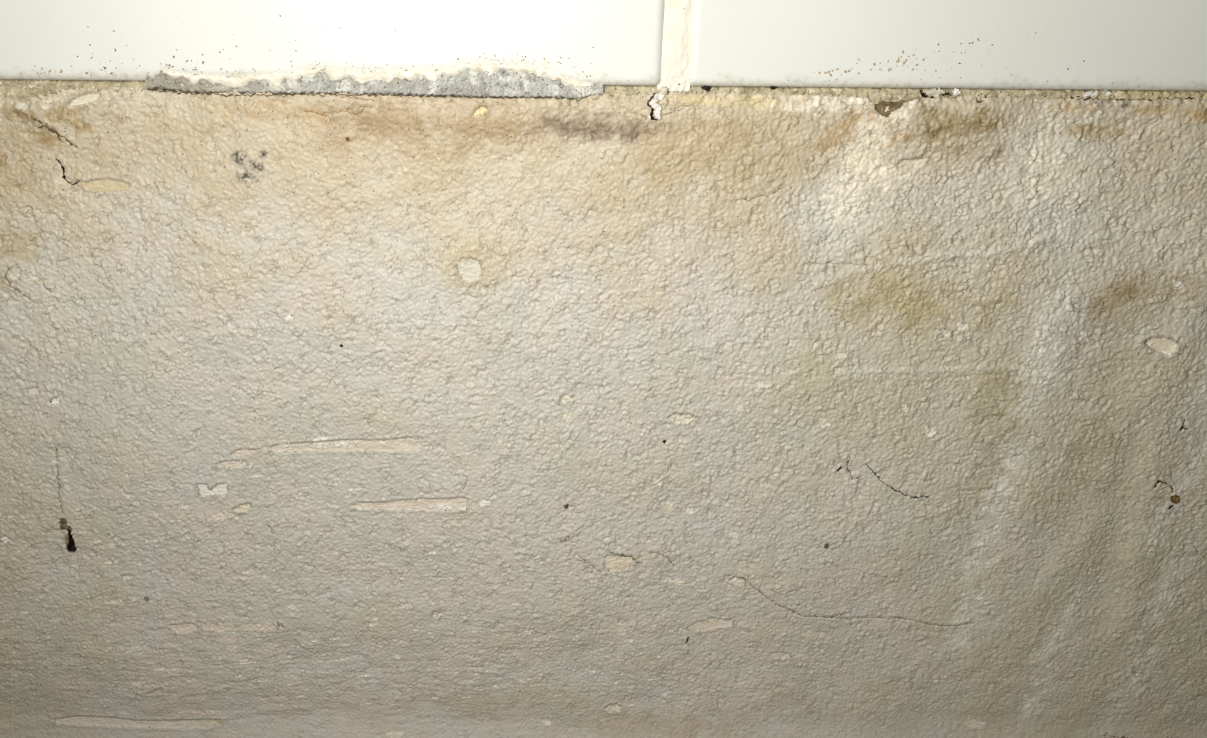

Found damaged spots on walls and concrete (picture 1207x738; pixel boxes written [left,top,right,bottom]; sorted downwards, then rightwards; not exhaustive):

damp [20,44,204,80]
spalling [145,62,604,115]
damp [814,38,993,87]
crack [32,118,79,185]
damp [0,100,83,317]
damp [153,83,1207,738]
crack [847,457,929,499]
crack [728,575,972,626]